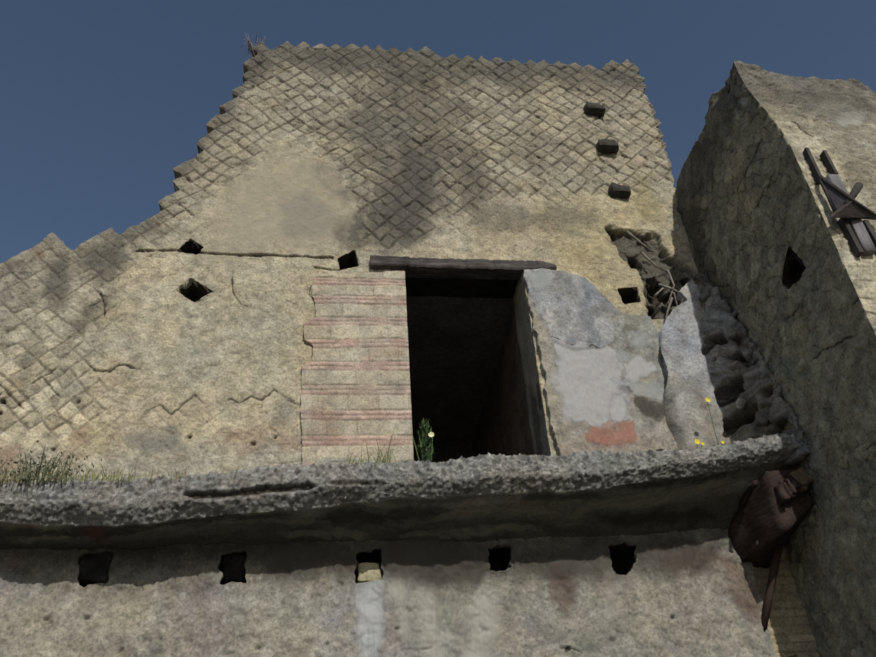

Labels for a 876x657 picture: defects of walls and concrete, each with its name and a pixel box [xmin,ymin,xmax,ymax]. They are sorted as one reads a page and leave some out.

crack [91,364,135,373]
peeling [522,268,678,456]
crack [151,395,202,415]
crack [228,389,278,403]
water stain [0,467,744,657]